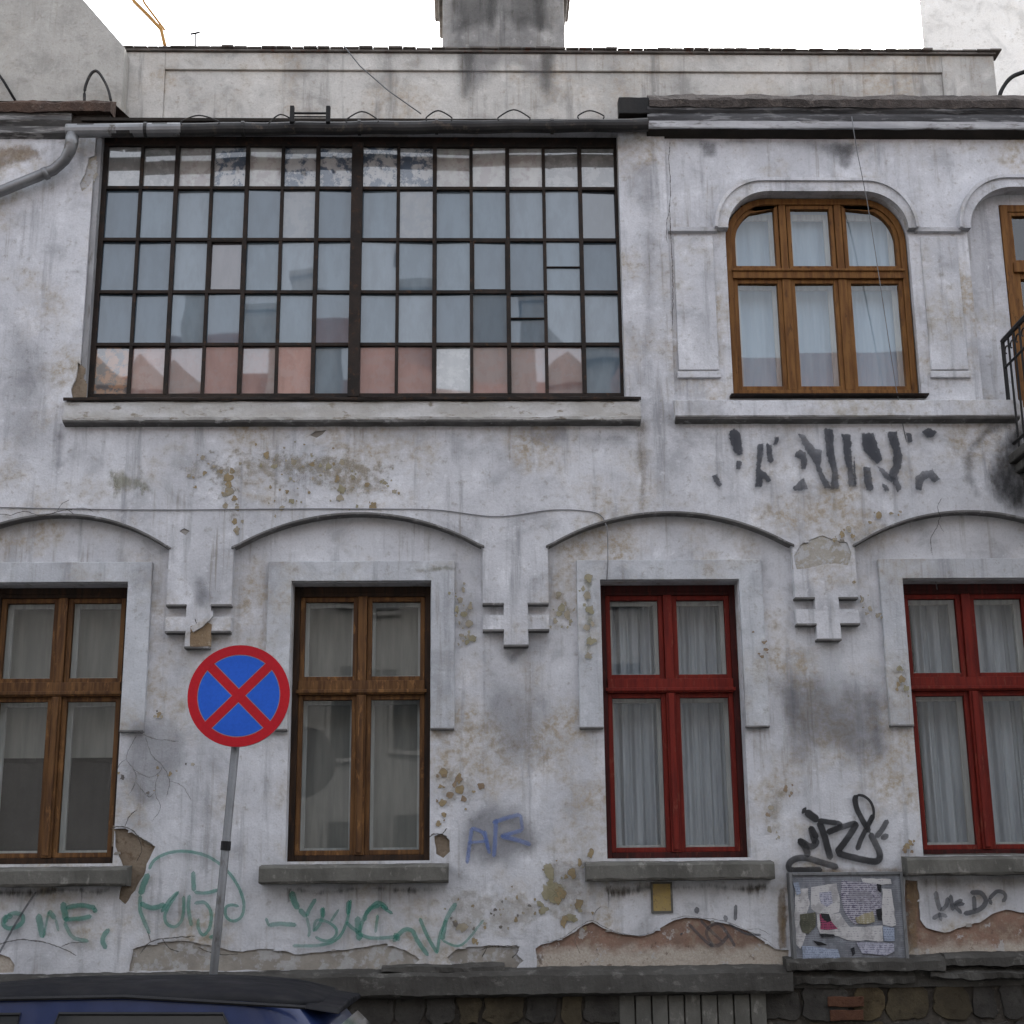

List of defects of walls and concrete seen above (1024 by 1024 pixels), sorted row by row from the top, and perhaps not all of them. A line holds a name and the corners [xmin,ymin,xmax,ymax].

flaking render [72,364,87,397]
peeling [187,454,244,535]
peeling [255,431,400,518]
water stain [992,429,1024,506]
flaking render [791,526,855,569]
peeling [549,574,597,659]
crack [110,731,191,861]
peeling [434,768,485,858]
flaking render [112,825,155,904]
flaking render [129,941,420,971]
flaking render [444,848,789,968]
flaking render [905,880,1024,955]